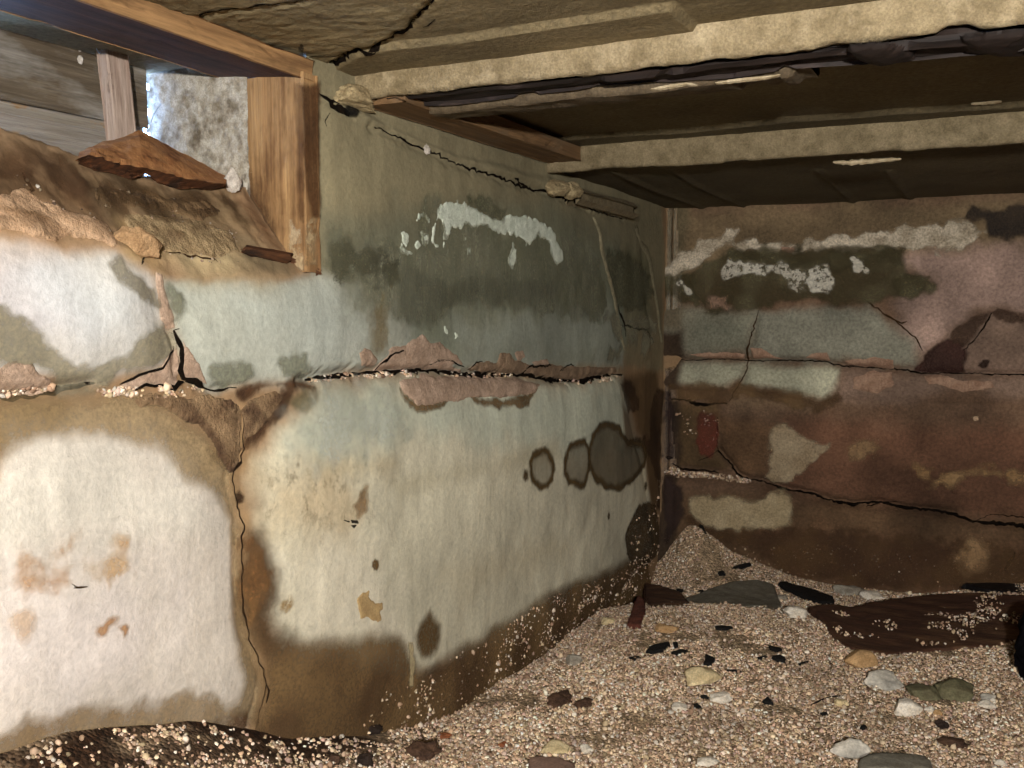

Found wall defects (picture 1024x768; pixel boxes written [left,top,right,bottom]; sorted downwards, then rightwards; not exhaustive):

crack [306,0,436,66]
crack [374,127,627,220]
peeling [400,201,563,269]
water stain [330,196,936,322]
crack [304,350,622,385]
spalling [359,326,619,406]
crack [665,302,1024,555]
crack [231,414,270,727]
water stain [0,305,1024,754]